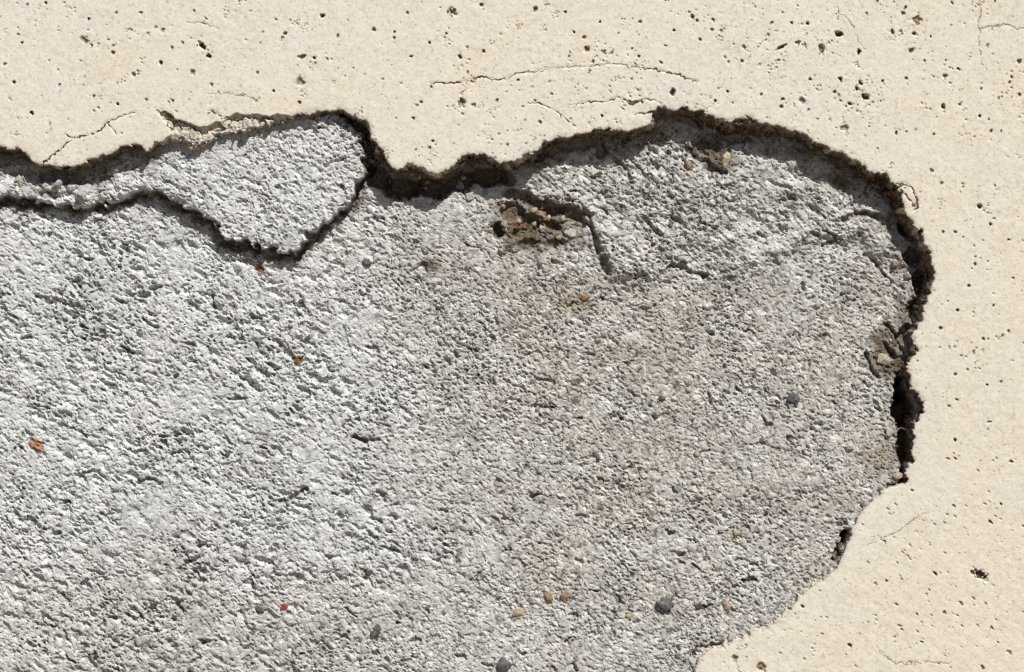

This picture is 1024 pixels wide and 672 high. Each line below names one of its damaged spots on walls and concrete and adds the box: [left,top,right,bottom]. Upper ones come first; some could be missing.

crack [430,63,697,85]
crack [40,91,258,165]
spalling [0,99,935,672]